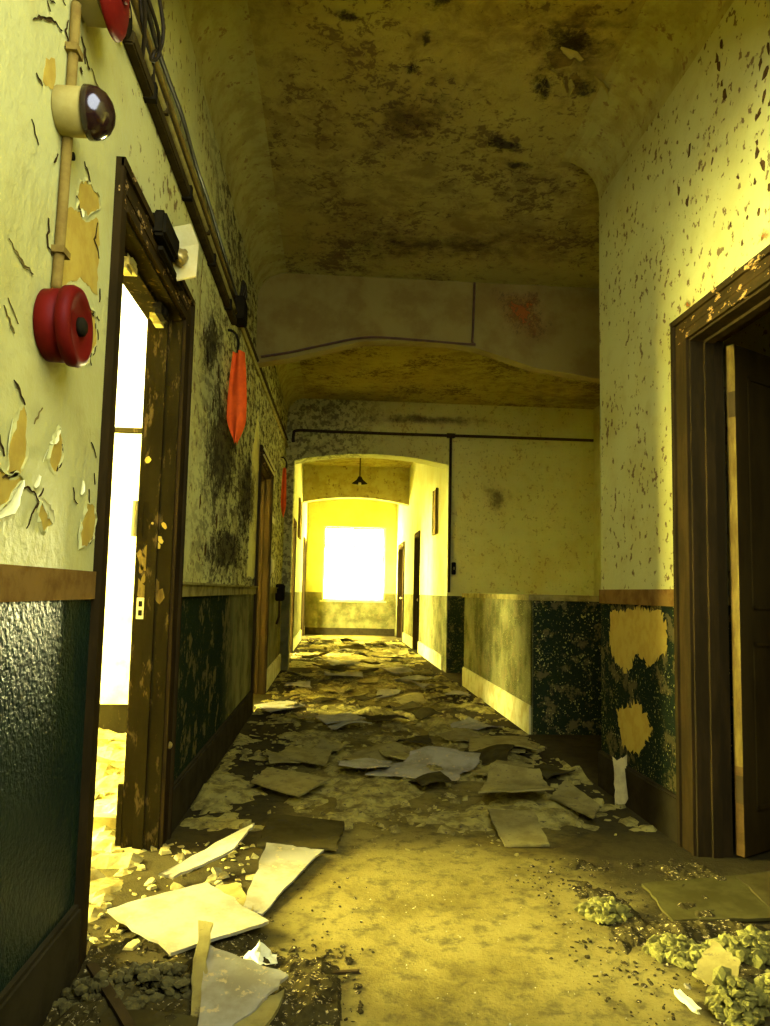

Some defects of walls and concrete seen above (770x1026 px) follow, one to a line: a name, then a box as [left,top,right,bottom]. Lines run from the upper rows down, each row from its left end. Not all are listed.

leakage [339,10,357,21]
leakage [533,64,556,99]
leakage [552,13,604,96]
leakage [488,136,526,169]
peeling [0,380,64,536]
leakage [199,314,256,574]
peeling [73,481,97,550]
peeling [609,605,668,674]
peeling [616,700,653,757]